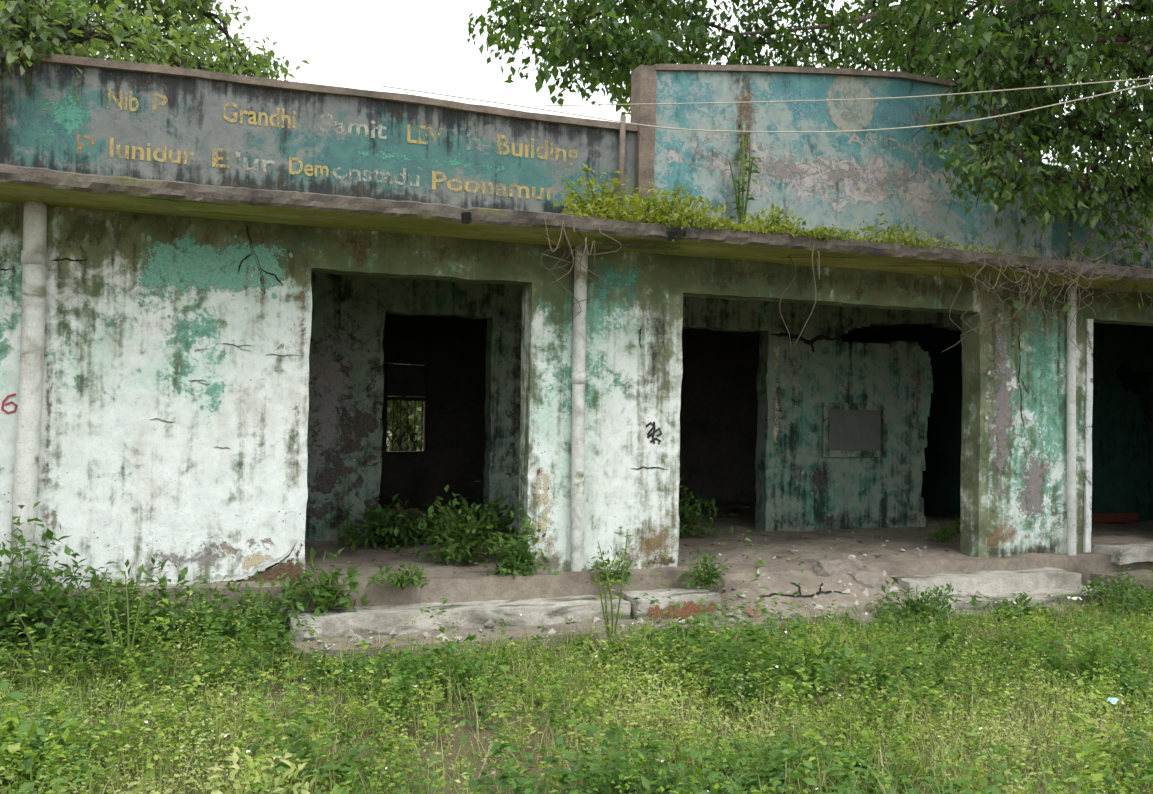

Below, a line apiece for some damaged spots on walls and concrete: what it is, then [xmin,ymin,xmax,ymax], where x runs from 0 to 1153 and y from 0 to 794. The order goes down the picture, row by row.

peeling [689,134,916,200]
peeling [135,233,293,299]
crack [149,198,283,296]
peeling [164,315,221,343]
water stain [647,306,666,375]
crack [771,332,841,353]
water stain [42,507,57,549]
flaking render [86,540,303,588]
flaking render [643,552,675,569]